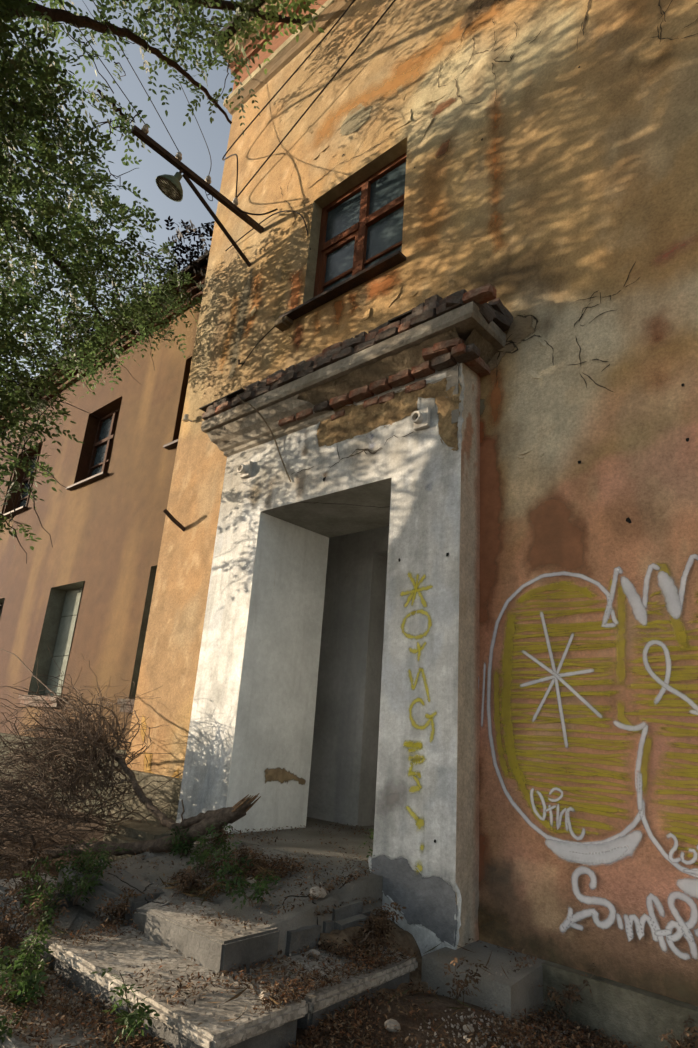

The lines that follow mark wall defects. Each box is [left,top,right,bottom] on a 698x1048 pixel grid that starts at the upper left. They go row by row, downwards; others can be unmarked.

spalling [460,0,504,30]
crack [438,5,541,105]
crack [576,0,593,51]
crack [652,0,698,41]
crack [495,262,640,392]
spalling [315,374,465,452]
water stain [527,496,585,572]
spalling [265,768,306,785]
spalling [368,852,462,950]